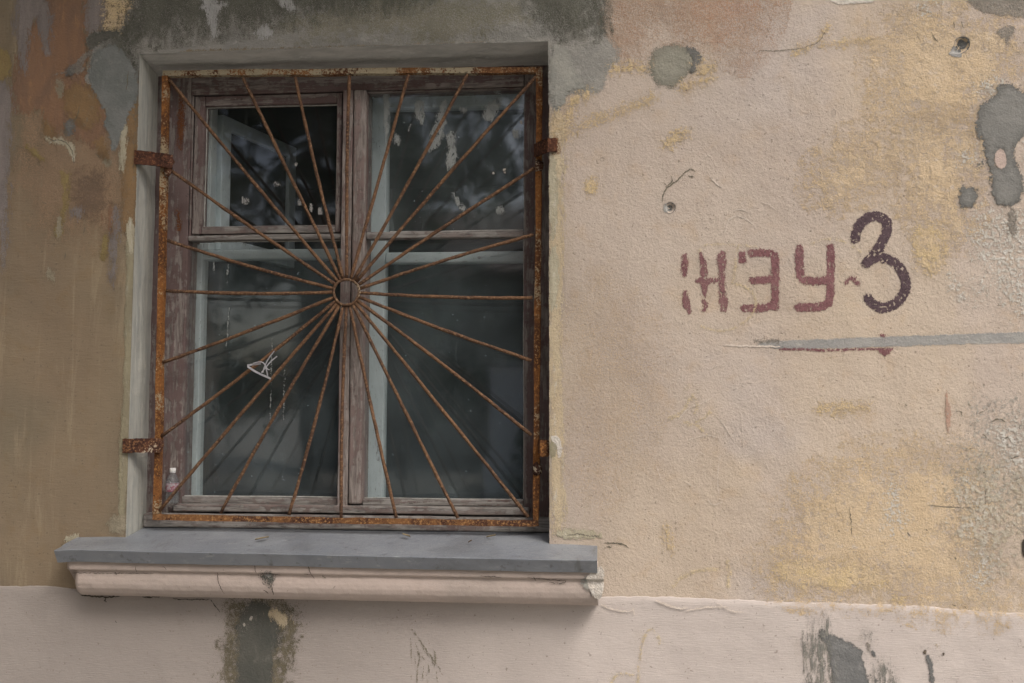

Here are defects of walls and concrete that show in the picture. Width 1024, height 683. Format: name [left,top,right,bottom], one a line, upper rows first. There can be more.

water stain [102,0,440,105]
peeling [787,0,1024,279]
peeling [549,53,720,541]